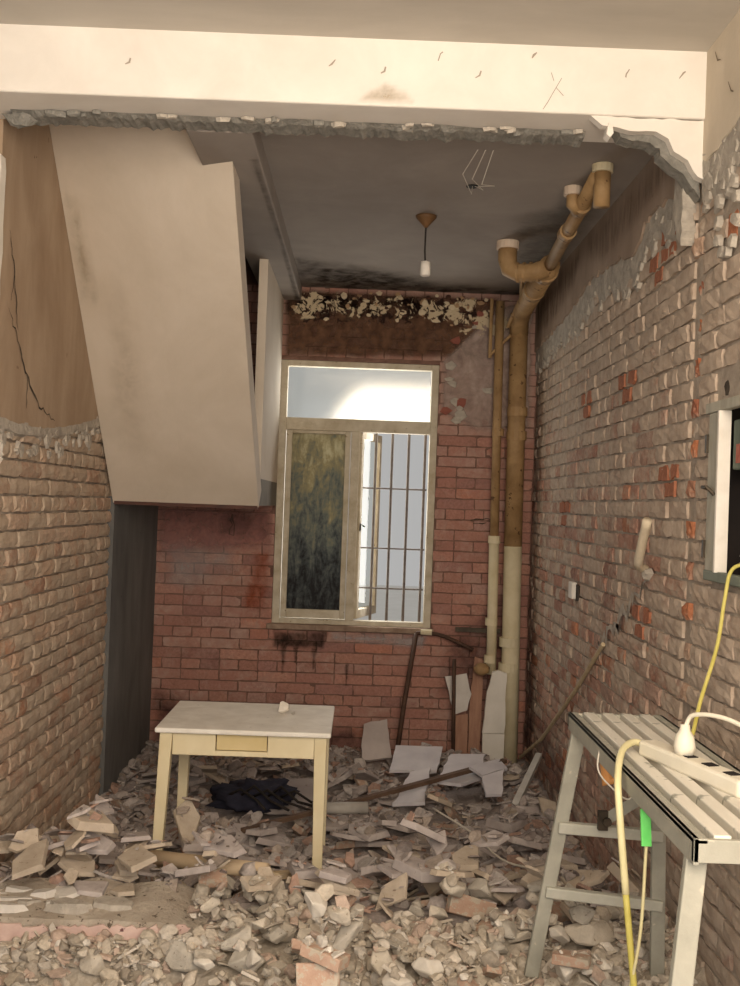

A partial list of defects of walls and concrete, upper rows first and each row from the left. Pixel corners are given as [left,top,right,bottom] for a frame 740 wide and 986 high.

spalling [2,109,585,148]
flaking render [525,117,740,426]
peeling [286,291,515,428]
flaking render [0,416,101,459]
spalling [690,399,699,458]
spalling [658,464,696,498]
damp [275,633,324,663]